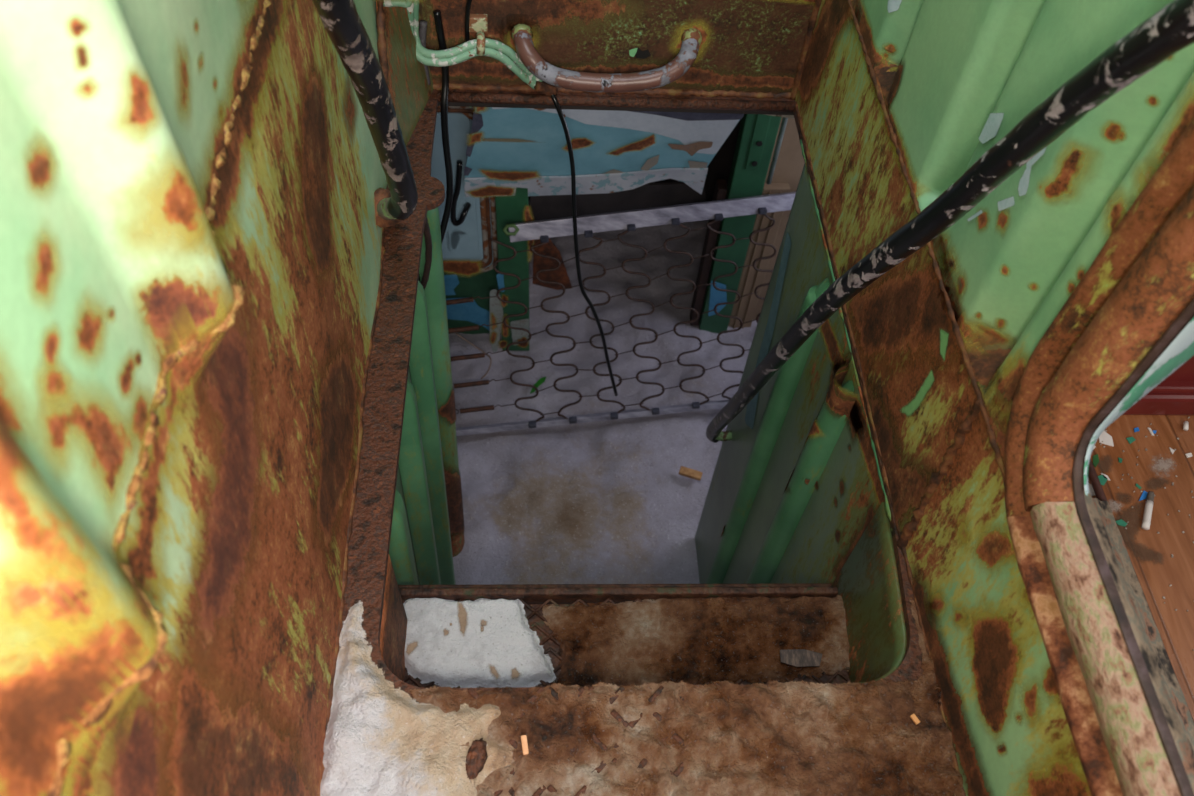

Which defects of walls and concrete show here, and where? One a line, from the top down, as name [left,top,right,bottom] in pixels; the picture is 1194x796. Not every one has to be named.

peeling [887,0,902,13]
rust [70,18,88,68]
rust [27,144,55,191]
rust [123,71,155,132]
rust [132,0,285,242]
peeling [464,107,504,176]
peeling [526,108,744,168]
peeling [979,113,1004,144]
peeling [998,147,1046,211]
rust [821,233,1016,576]
rust [0,274,315,796]
rust [912,569,1058,796]